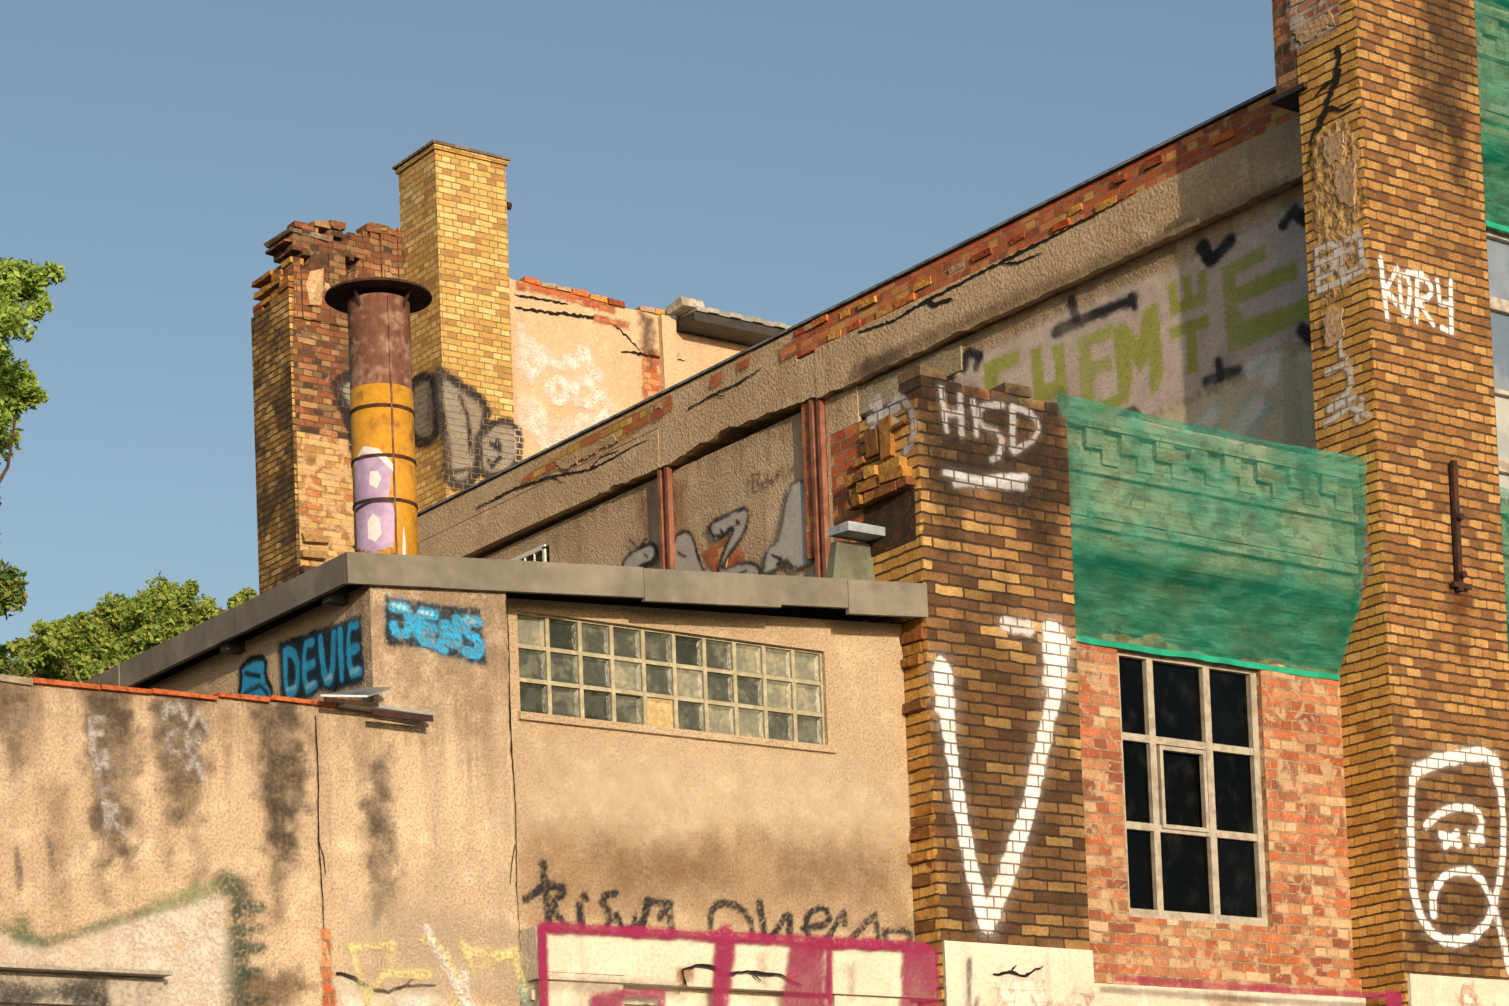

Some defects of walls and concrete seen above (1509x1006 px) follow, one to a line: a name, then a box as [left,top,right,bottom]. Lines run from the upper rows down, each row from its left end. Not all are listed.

spalling [1286,0,1340,52]
crack [1308,44,1355,167]
crack [858,191,1138,333]
crack [514,294,685,361]
flaking render [703,539,744,572]
water stain [265,748,302,857]